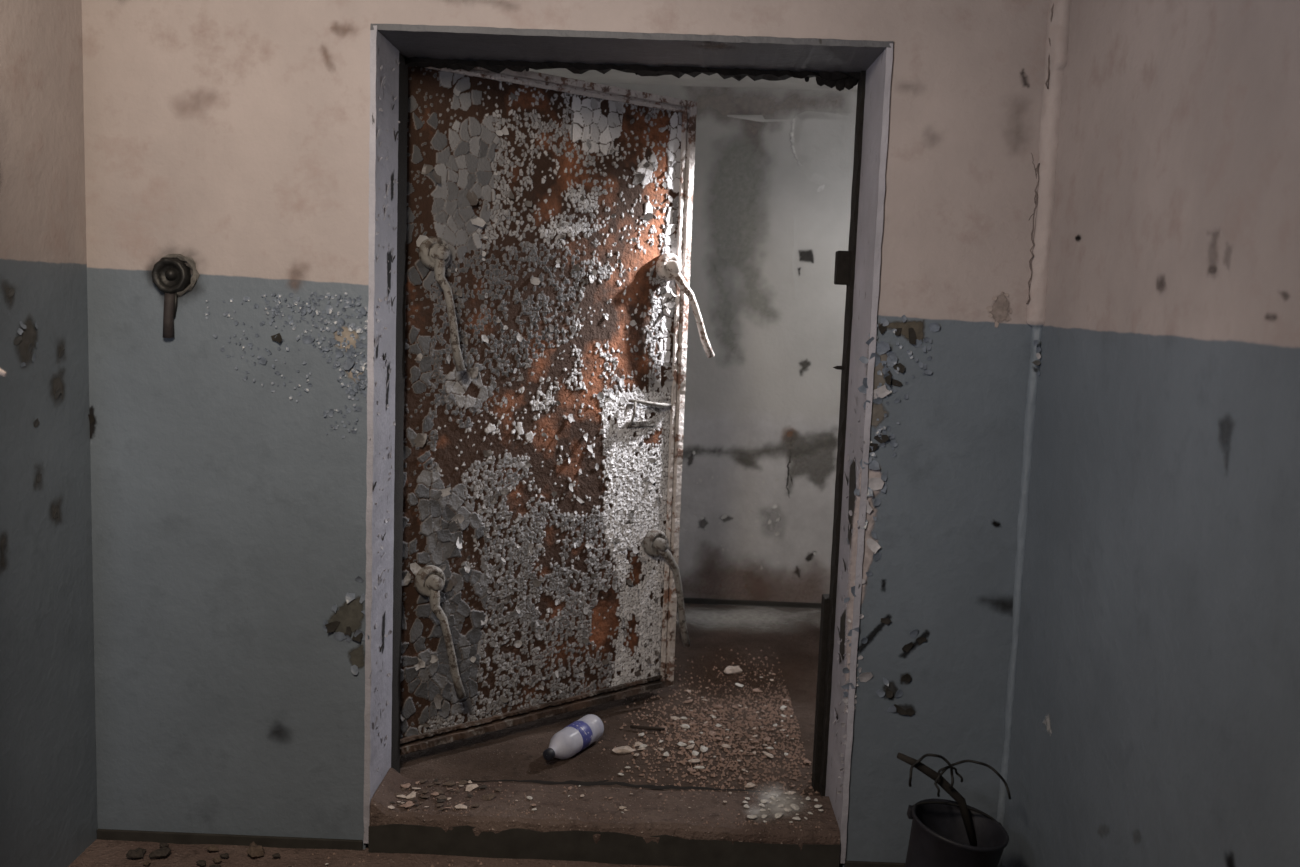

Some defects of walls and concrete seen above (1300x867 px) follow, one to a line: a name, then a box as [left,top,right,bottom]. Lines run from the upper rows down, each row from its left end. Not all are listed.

peeling [586,139,676,203]
peeling [375,61,400,426]
water stain [696,88,838,351]
peeling [548,258,597,339]
peeling [658,282,677,338]
peeling [597,362,674,412]
peeling [552,434,622,514]
peeling [439,514,471,593]
peeling [607,505,646,562]
peeling [833,315,940,794]
peeling [322,446,421,745]
flaking render [723,792,824,823]